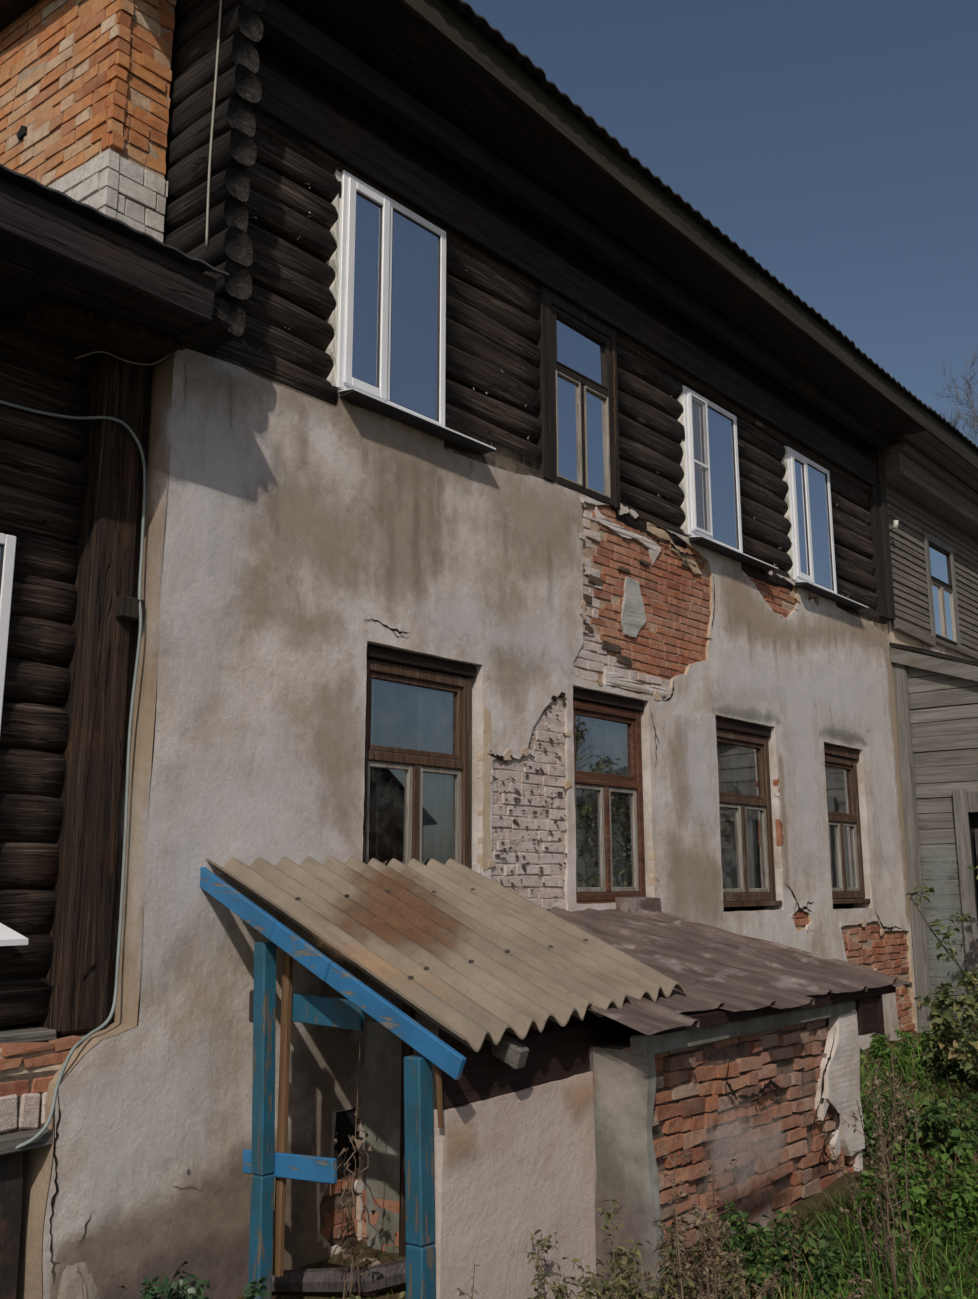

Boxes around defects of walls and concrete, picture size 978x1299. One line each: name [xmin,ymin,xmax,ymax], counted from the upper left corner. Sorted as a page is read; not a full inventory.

crack [364,618,409,638]
spalling [573,496,713,700]
spalling [748,571,819,618]
peeling [472,692,574,911]
crack [49,1094,96,1285]